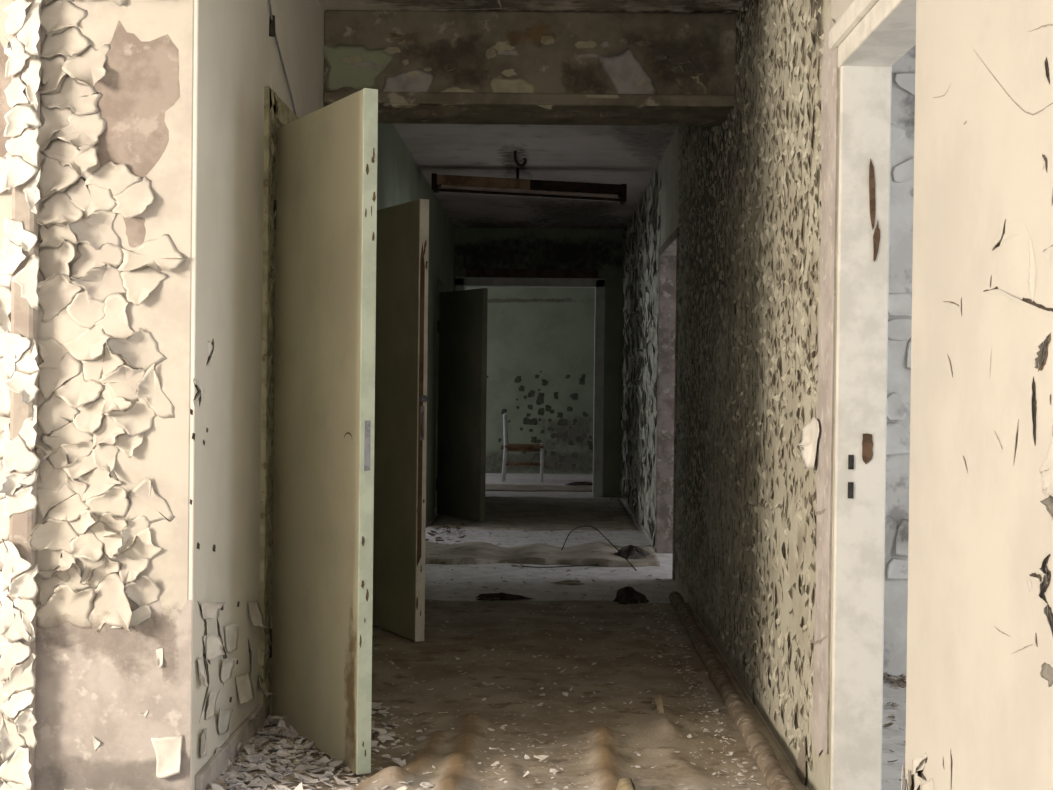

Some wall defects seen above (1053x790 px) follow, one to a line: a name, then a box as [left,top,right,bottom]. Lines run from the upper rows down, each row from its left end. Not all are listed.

water stain [377,0,759,63]
water stain [635,37,725,95]
water stain [811,0,823,42]
crack [974,51,1053,115]
water stain [687,111,739,346]
crack [1042,154,1053,204]
peeling [0,0,279,790]
peeling [620,162,661,548]
peeling [673,0,839,784]
crack [943,219,1053,466]
crack [994,552,1053,653]
spalling [1040,662,1053,687]